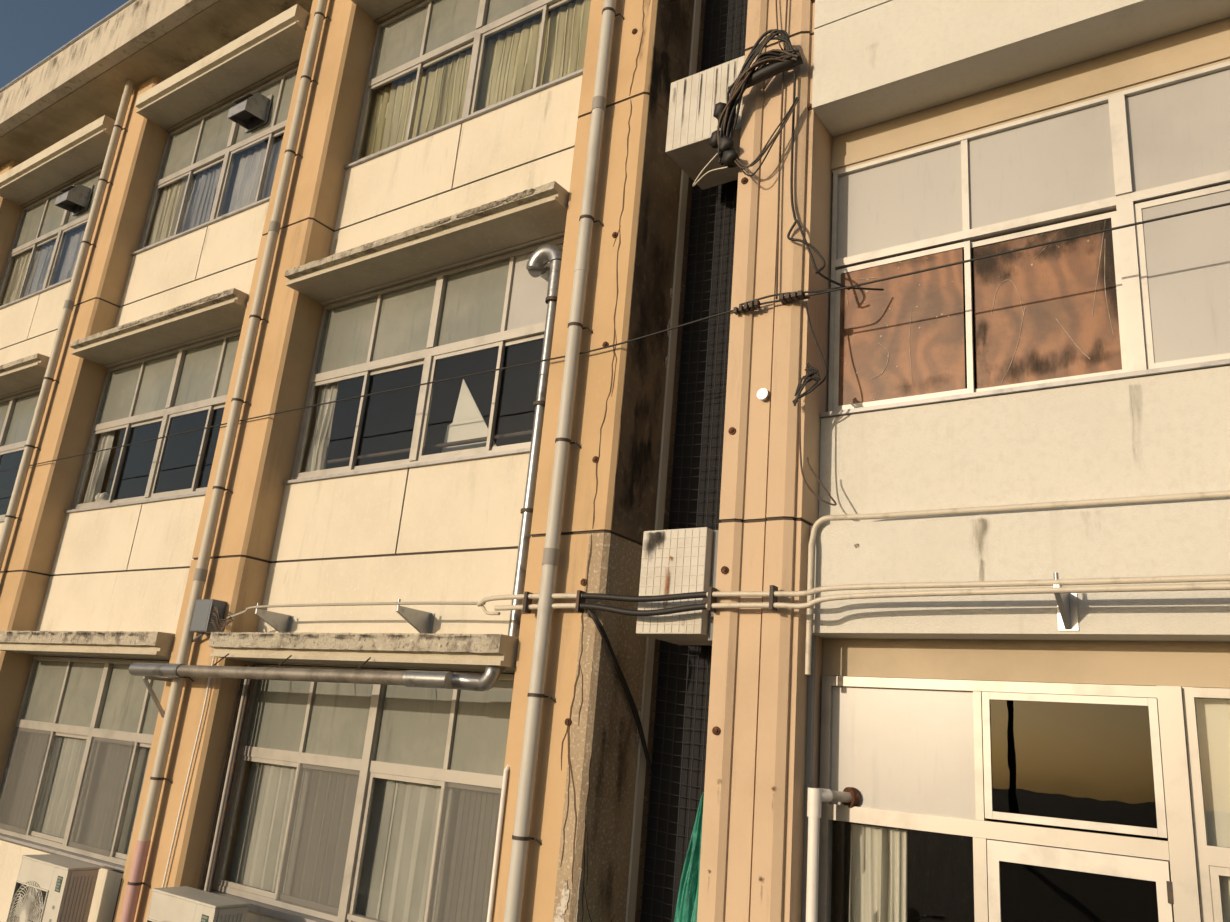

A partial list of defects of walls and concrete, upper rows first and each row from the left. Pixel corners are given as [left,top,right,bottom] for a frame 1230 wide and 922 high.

damp [649,53,735,117]
crack [560,0,650,922]
damp [646,531,664,552]
peeling [553,869,583,922]